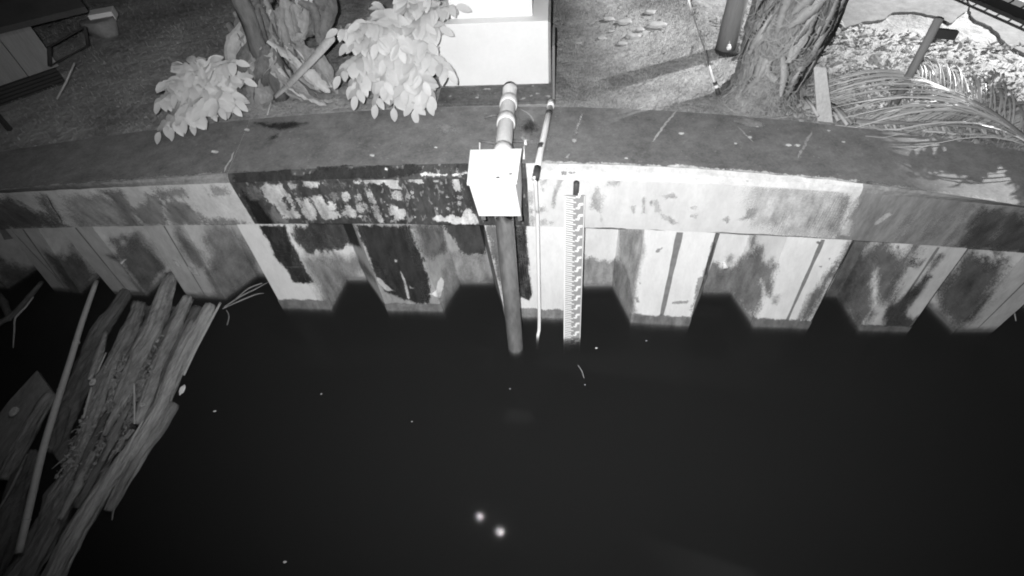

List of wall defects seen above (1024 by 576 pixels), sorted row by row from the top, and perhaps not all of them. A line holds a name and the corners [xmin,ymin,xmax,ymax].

damp [0,188,256,295]
peeling [245,168,479,225]
damp [703,188,1024,340]